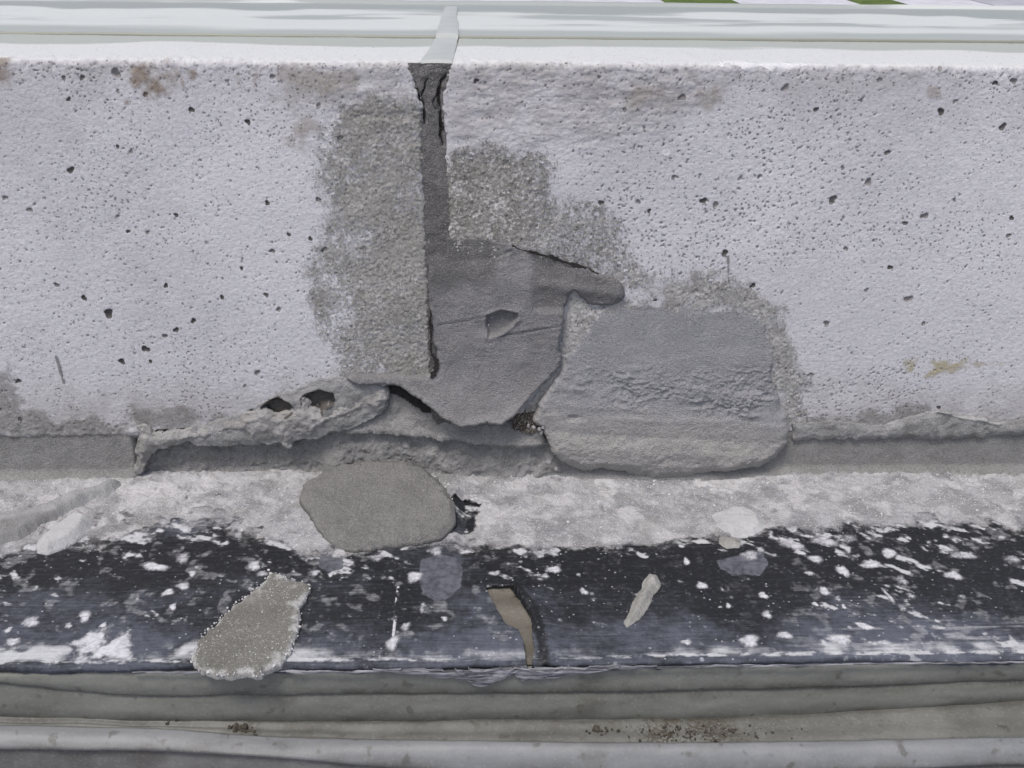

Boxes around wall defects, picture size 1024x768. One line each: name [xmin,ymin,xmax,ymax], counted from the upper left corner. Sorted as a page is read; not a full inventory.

crack [414,75,446,145]
crack [512,245,599,274]
crack [428,308,439,379]